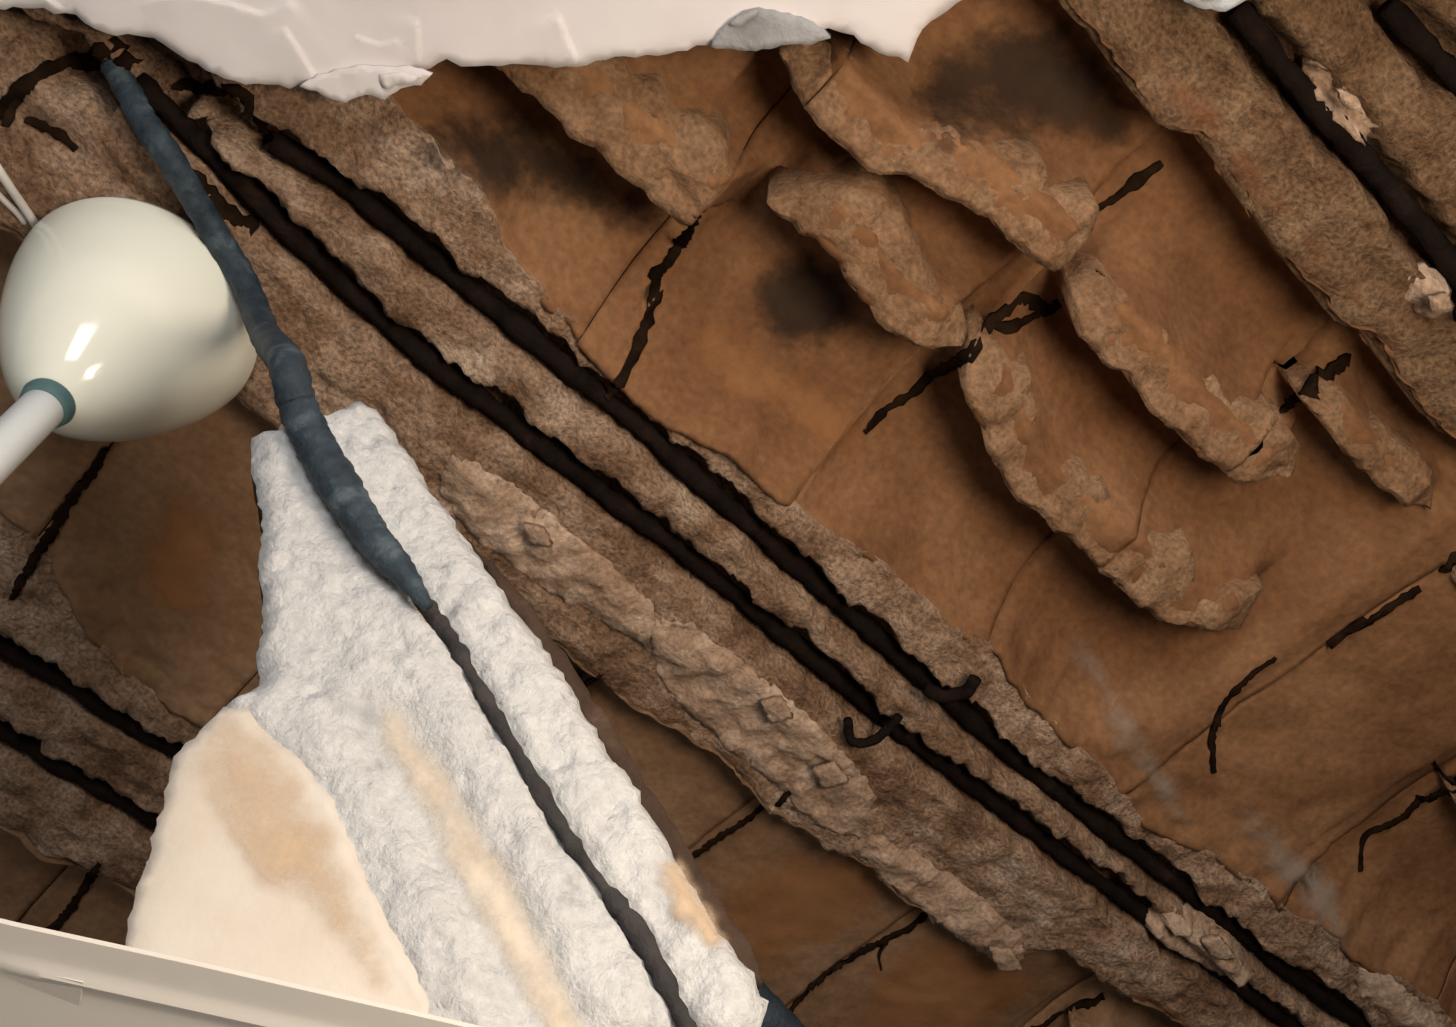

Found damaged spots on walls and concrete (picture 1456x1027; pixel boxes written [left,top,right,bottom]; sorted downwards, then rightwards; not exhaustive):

peeling [711,7,831,51]
peeling [299,64,433,103]
spalling [1300,54,1383,146]
crack [604,215,702,401]
leakage [762,258,849,338]
crack [1326,551,1456,650]
spalling [440,447,1026,972]
crack [1207,656,1277,774]
crack [45,862,103,931]
leakage [227,754,330,889]
leakage [386,714,580,1027]
spalling [1144,901,1254,988]